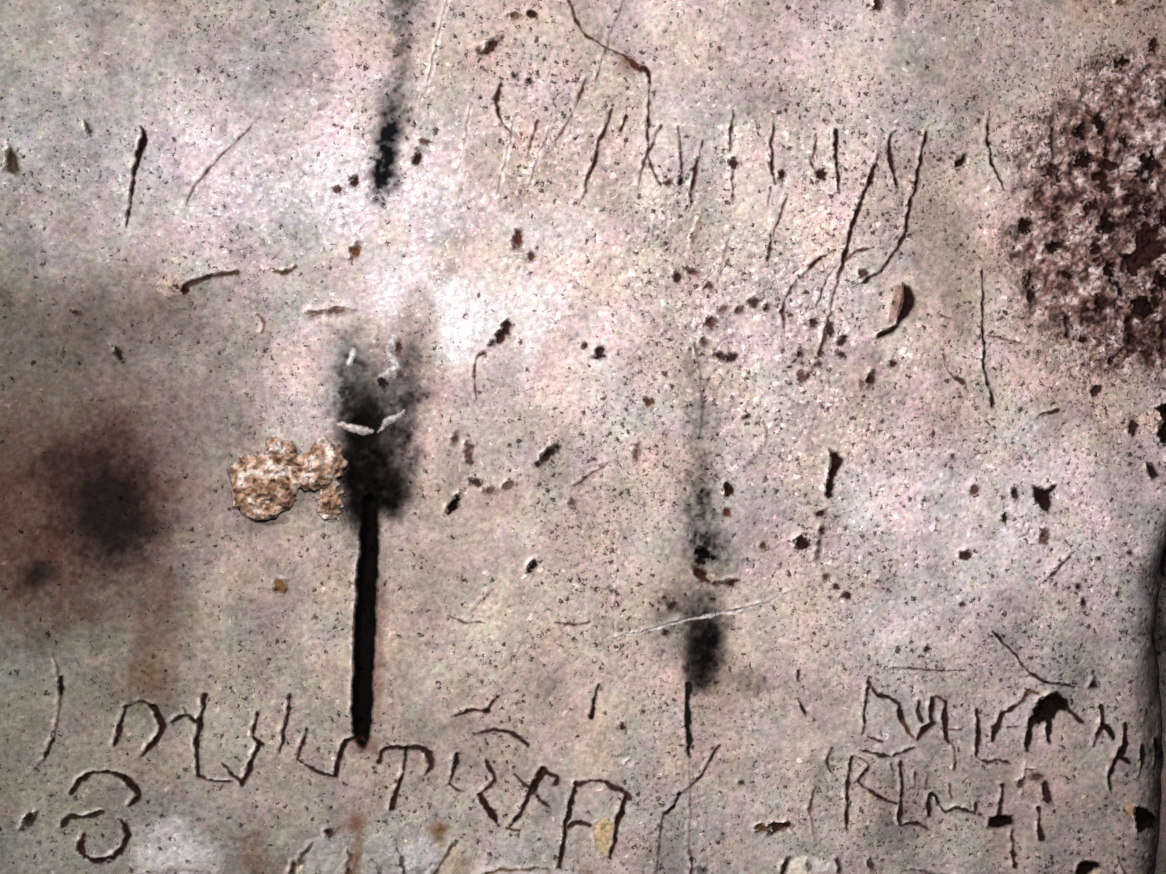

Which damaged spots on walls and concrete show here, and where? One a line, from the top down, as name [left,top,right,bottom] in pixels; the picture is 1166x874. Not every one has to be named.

spalling [989,35,1166,481]
water stain [0,698,72,798]
water stain [0,263,251,725]
crack [349,493,382,751]